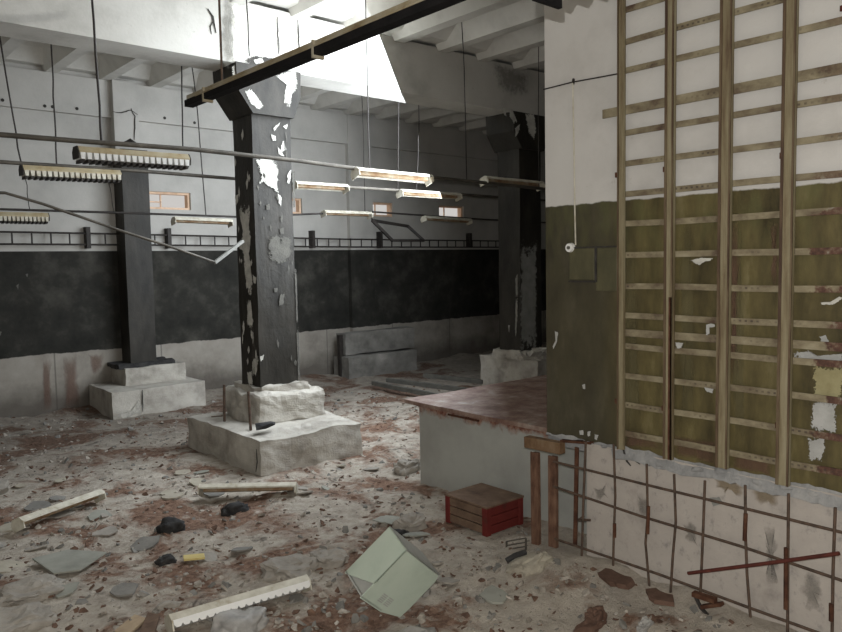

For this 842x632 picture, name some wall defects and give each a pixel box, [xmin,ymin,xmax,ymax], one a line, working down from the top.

peeling [245,89,263,109]
peeling [276,70,298,106]
peeling [503,107,536,138]
peeling [235,123,300,431]
peeling [508,239,537,350]
peeling [794,351,842,462]
spalling [22,524,97,551]
corrosion [560,439,594,545]